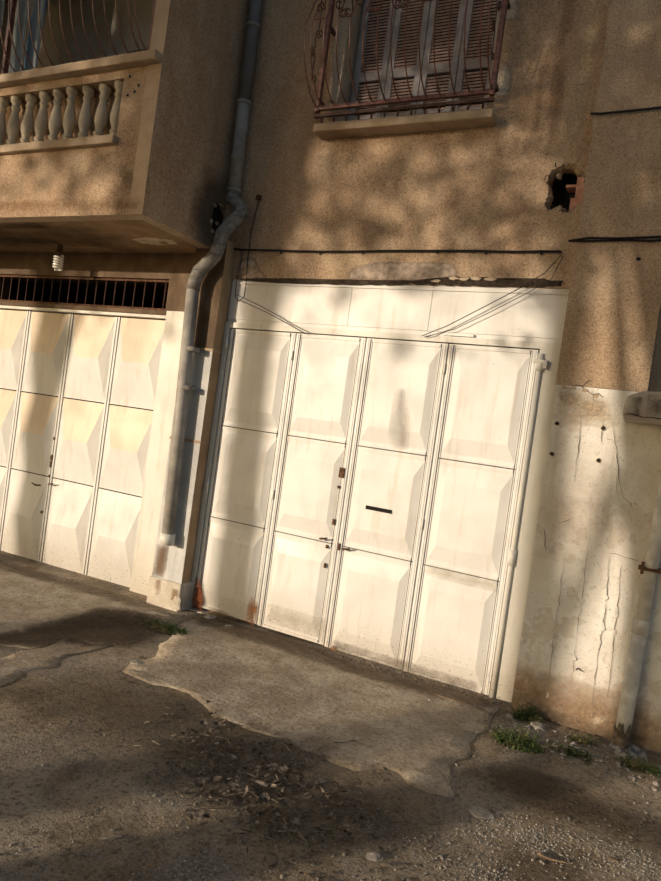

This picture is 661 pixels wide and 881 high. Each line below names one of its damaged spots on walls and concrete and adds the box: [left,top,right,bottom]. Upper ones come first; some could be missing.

spalling [539,150,589,225]
crack [559,380,604,399]
crack [601,413,661,507]
rust [192,580,202,608]
crack [544,521,640,716]